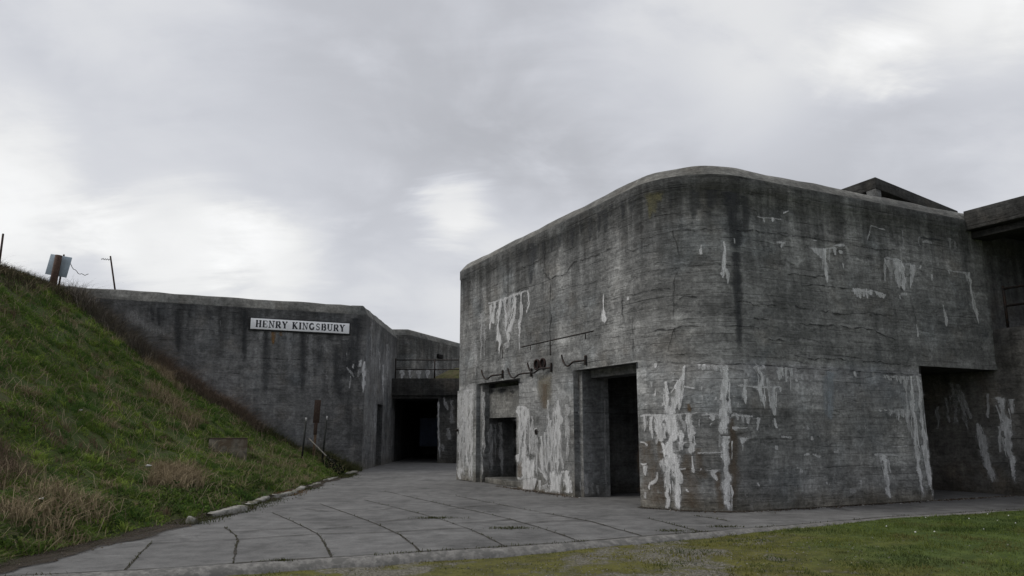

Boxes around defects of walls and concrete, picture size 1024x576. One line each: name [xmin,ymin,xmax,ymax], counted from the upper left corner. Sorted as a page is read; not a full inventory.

damp [489,212,607,351]
damp [812,240,844,282]
damp [886,258,933,295]
damp [948,270,979,323]
damp [342,318,366,391]
damp [457,389,483,479]
damp [516,400,572,493]
damp [640,365,702,508]
damp [875,453,891,497]
damp [886,376,933,494]
damp [976,397,1016,480]